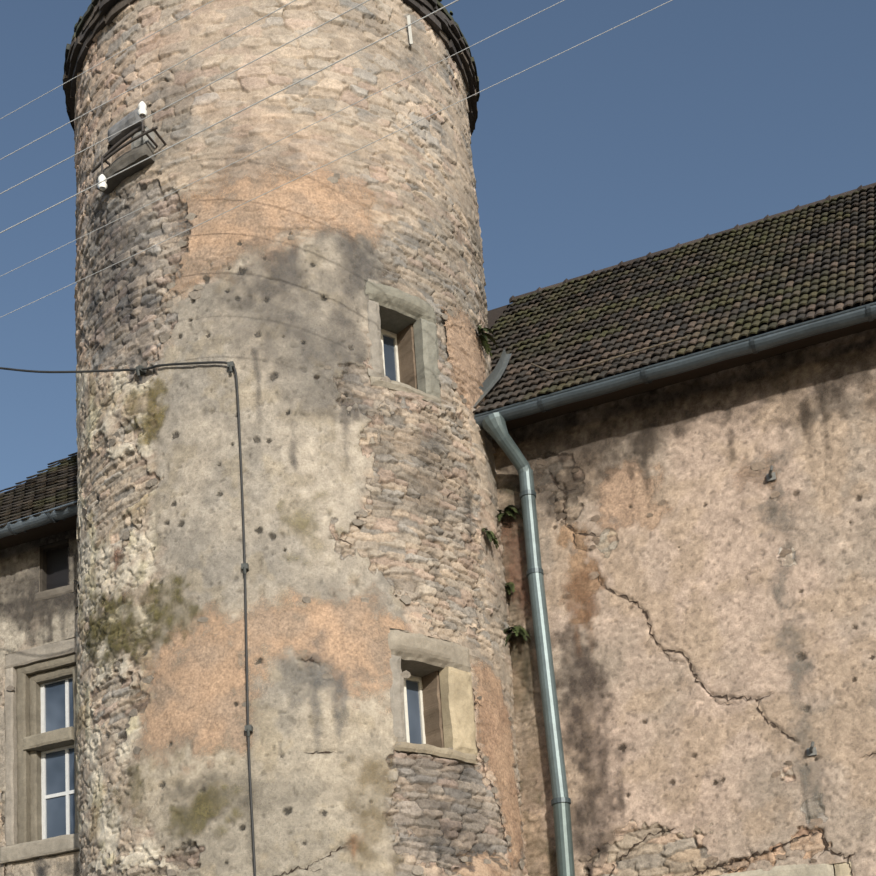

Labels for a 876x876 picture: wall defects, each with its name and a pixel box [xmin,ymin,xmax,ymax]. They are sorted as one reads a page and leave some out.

spalling [78,166,381,390]
water stain [242,249,299,304]
spalling [79,307,488,759]
crack [549,471,600,550]
crack [598,577,796,741]
water stain [556,628,622,853]
flaking render [7,841,205,876]
crack [274,843,352,876]
spalling [379,743,512,876]
spalling [579,793,832,876]